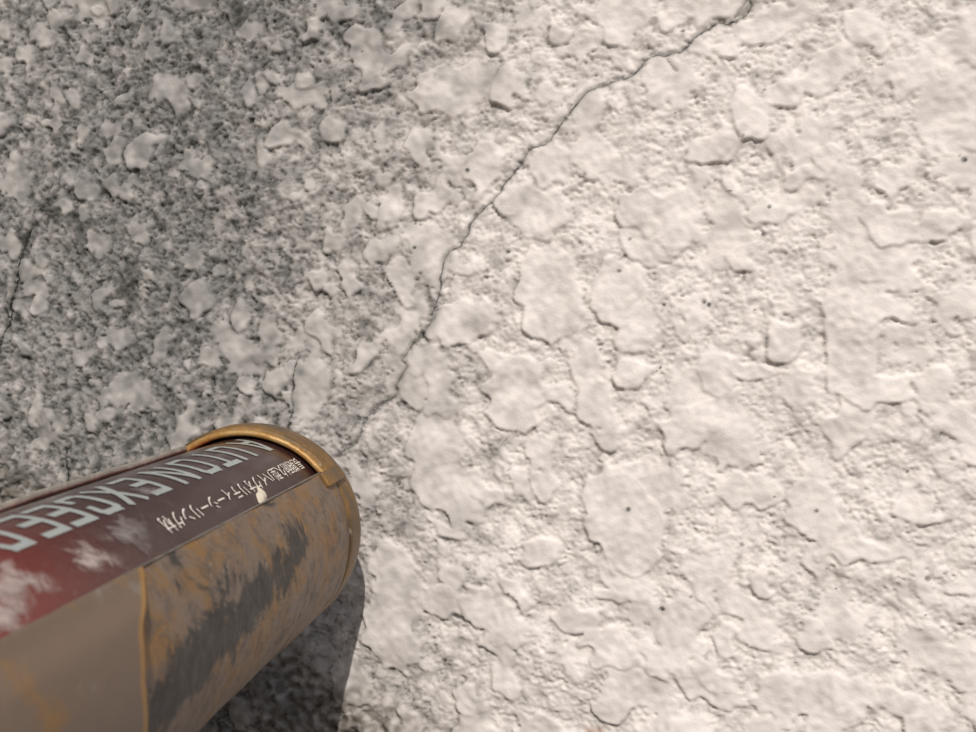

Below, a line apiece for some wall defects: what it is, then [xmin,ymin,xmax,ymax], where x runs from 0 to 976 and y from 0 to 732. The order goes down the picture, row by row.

crack [0,225,36,346]
crack [339,0,753,455]